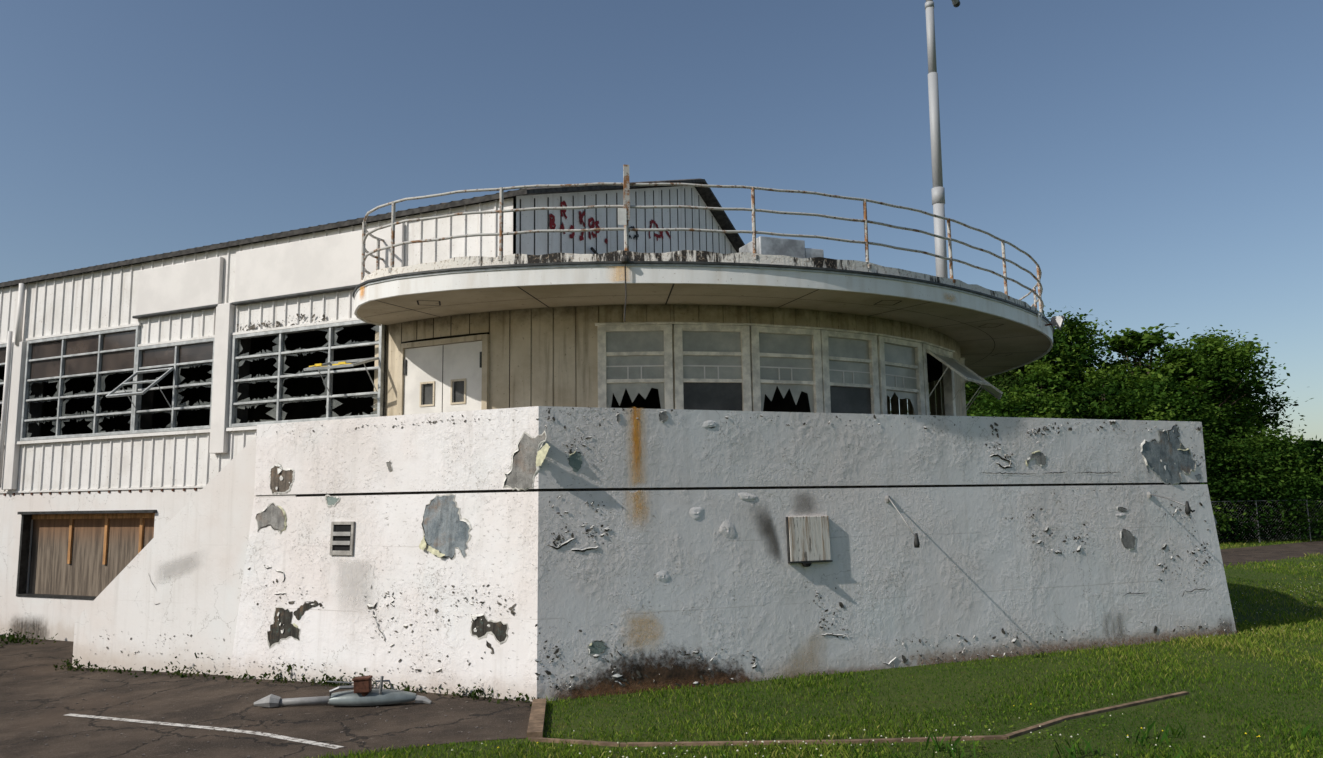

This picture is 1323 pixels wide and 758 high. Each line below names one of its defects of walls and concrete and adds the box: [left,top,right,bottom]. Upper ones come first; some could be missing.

peeling [503,408,639,491]
peeling [828,415,1202,485]
peeling [256,463,295,535]
peeling [419,493,472,560]
peeling [549,496,613,546]
spalling [1120,529,1137,551]
peeling [89,565,353,679]
peeling [364,584,516,697]
peeling [535,621,757,695]